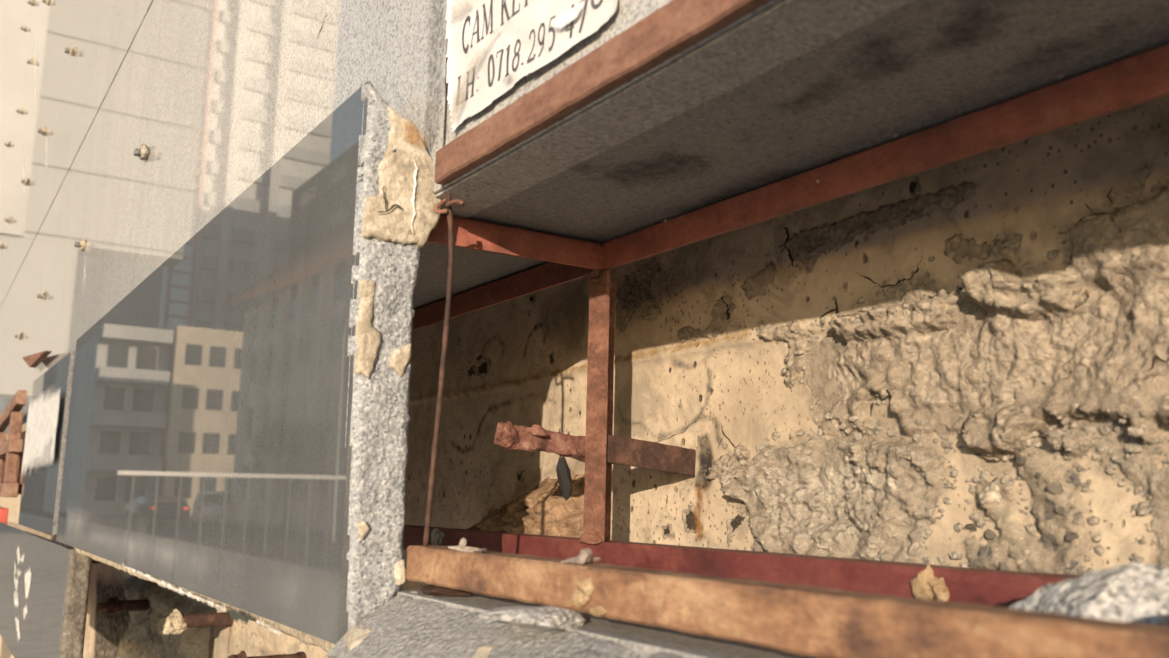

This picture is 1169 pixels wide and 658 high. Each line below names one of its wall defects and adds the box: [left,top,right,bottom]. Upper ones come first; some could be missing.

crack [377,186,403,213]
peeling [777,176,977,273]
peeling [944,233,1012,265]
crack [1075,182,1169,234]
peeling [677,261,778,344]
crack [1072,290,1090,316]
spalling [345,84,420,630]
peeling [756,320,819,392]
crack [1148,354,1169,371]
corrosion [694,439,712,539]
spalling [938,429,1111,576]
spalling [117,564,281,658]